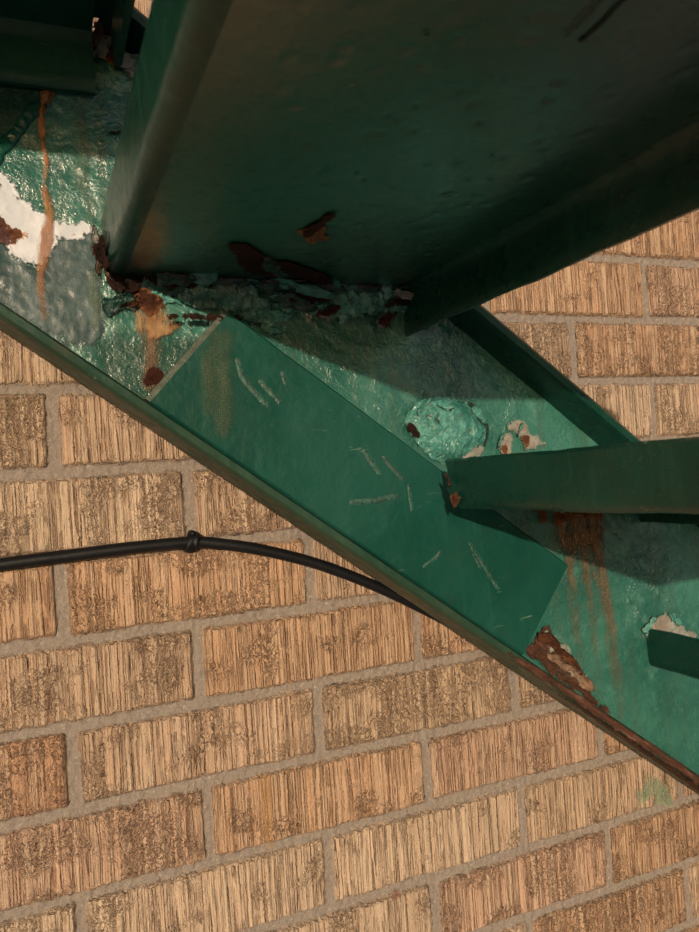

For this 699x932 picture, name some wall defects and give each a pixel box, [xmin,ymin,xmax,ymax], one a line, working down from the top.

rust [0,225,23,246]
rust [38,90,56,271]
peeling [0,173,413,347]
rust [102,287,179,388]
rust [536,510,612,625]
peeling [642,611,697,639]
rust [508,625,699,792]